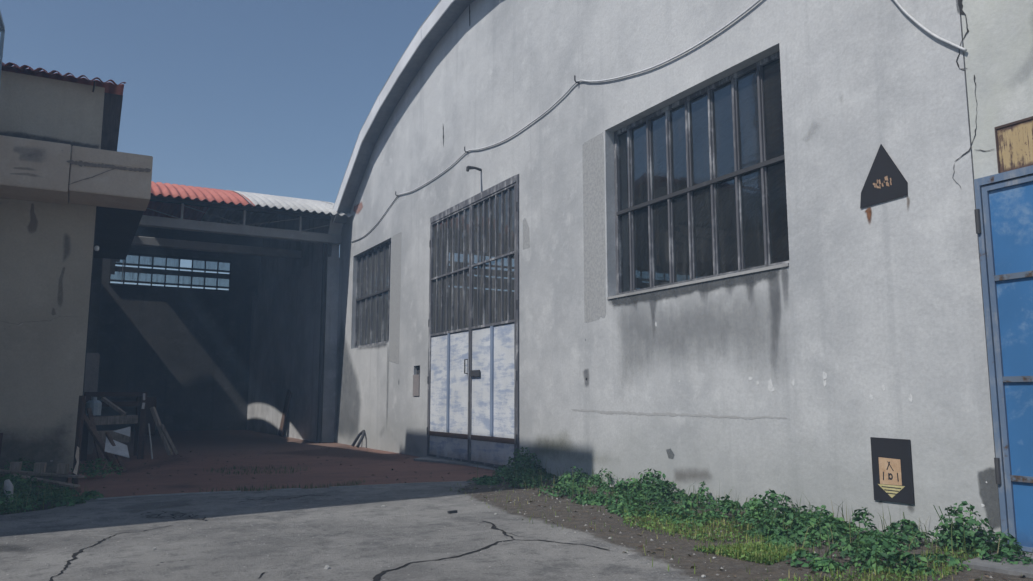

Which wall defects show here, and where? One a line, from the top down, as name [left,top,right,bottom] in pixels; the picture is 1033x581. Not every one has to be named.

damp [612,265,778,311]
crack [373,539,516,581]